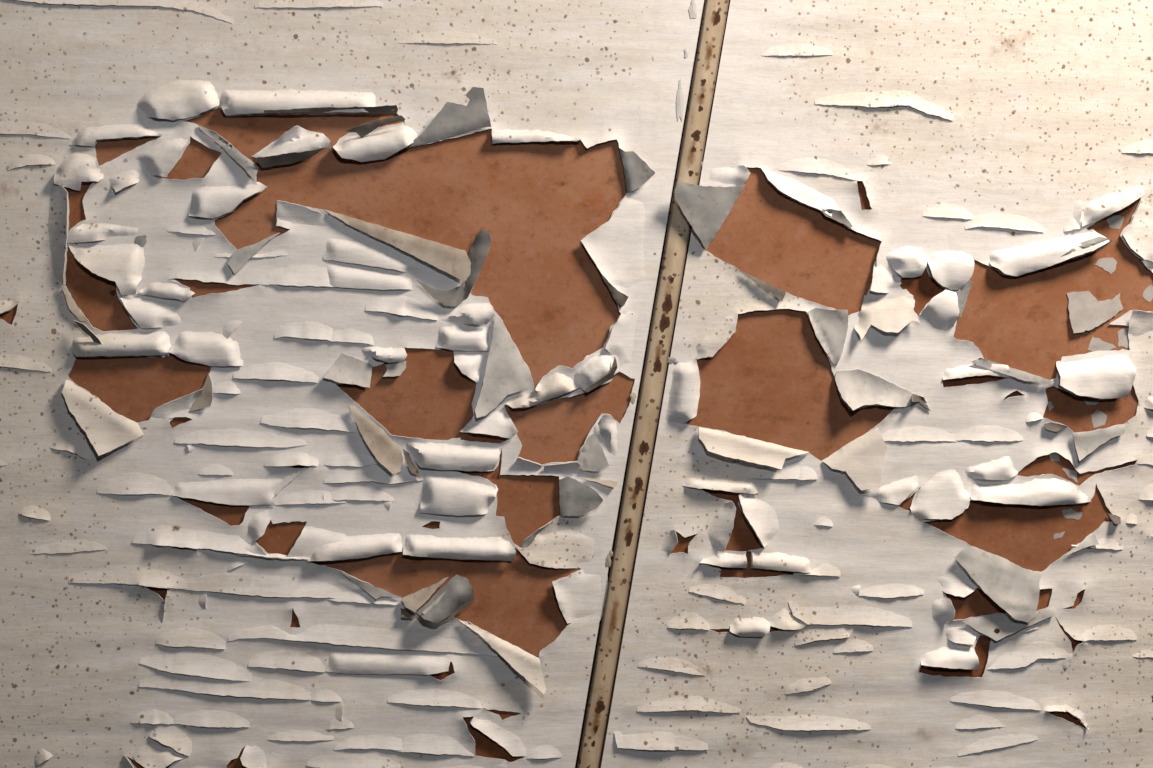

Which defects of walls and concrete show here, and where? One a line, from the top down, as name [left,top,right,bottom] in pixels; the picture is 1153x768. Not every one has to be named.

corrosion [699,10,720,111]
corrosion [688,130,701,176]
peeling [0,300,20,325]
corrosion [654,277,674,372]
peeling [48,79,656,694]
peeling [660,162,1153,678]
corrosion [624,477,643,546]
peeling [122,744,186,768]
peeling [226,745,267,768]
peeling [463,708,527,762]
corrosion [592,700,605,746]